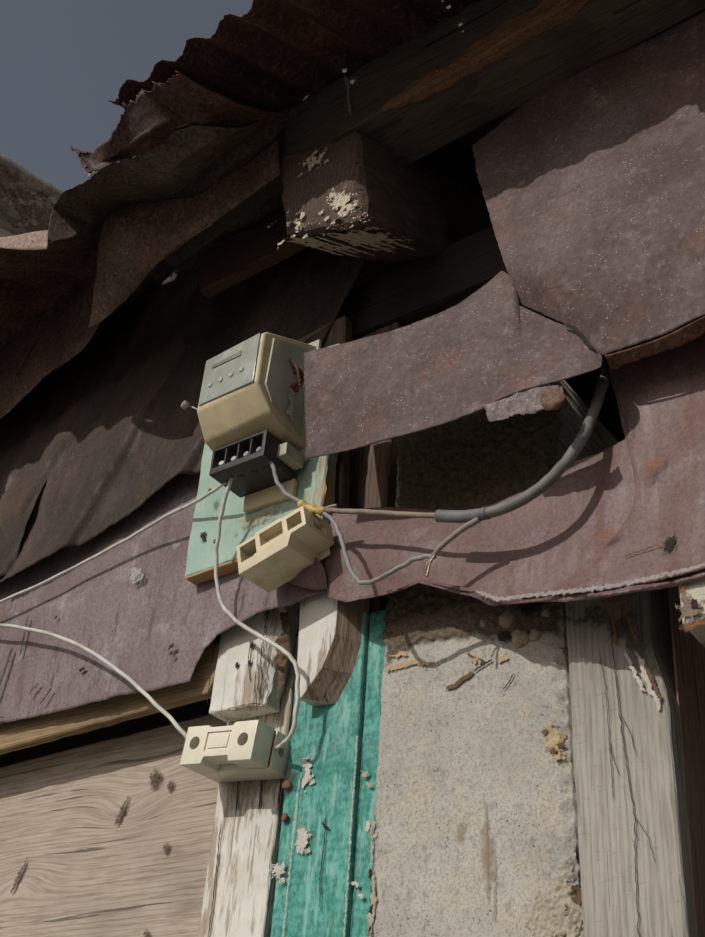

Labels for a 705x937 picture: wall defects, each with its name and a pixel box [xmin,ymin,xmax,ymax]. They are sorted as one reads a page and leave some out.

peeling [297,148,329,178]
peeling [267,188,414,258]
spalling [381,563,705,672]
crack [599,623,655,937]
peeling [265,757,315,937]